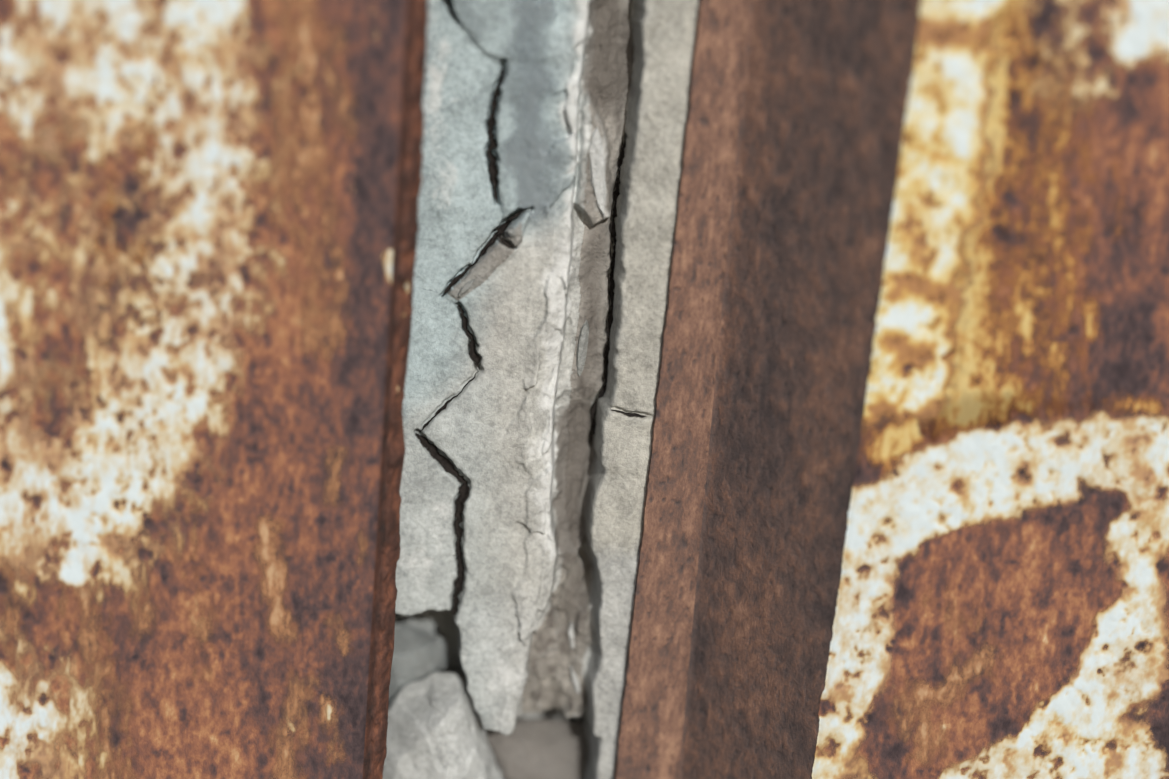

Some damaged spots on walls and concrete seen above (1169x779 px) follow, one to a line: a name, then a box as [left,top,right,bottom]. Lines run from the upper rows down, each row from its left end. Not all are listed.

crack [445,0,455,19]
corrosion [265,0,357,359]
crack [415,64,527,616]
crack [590,138,646,443]
corrosion [865,0,1098,473]
corrosion [1114,397,1161,415]
corrosion [324,446,346,504]
corrosion [59,582,133,779]
corrosion [255,516,297,642]
corrosion [274,677,343,779]
corrosion [327,619,349,655]
corrosion [894,645,995,764]